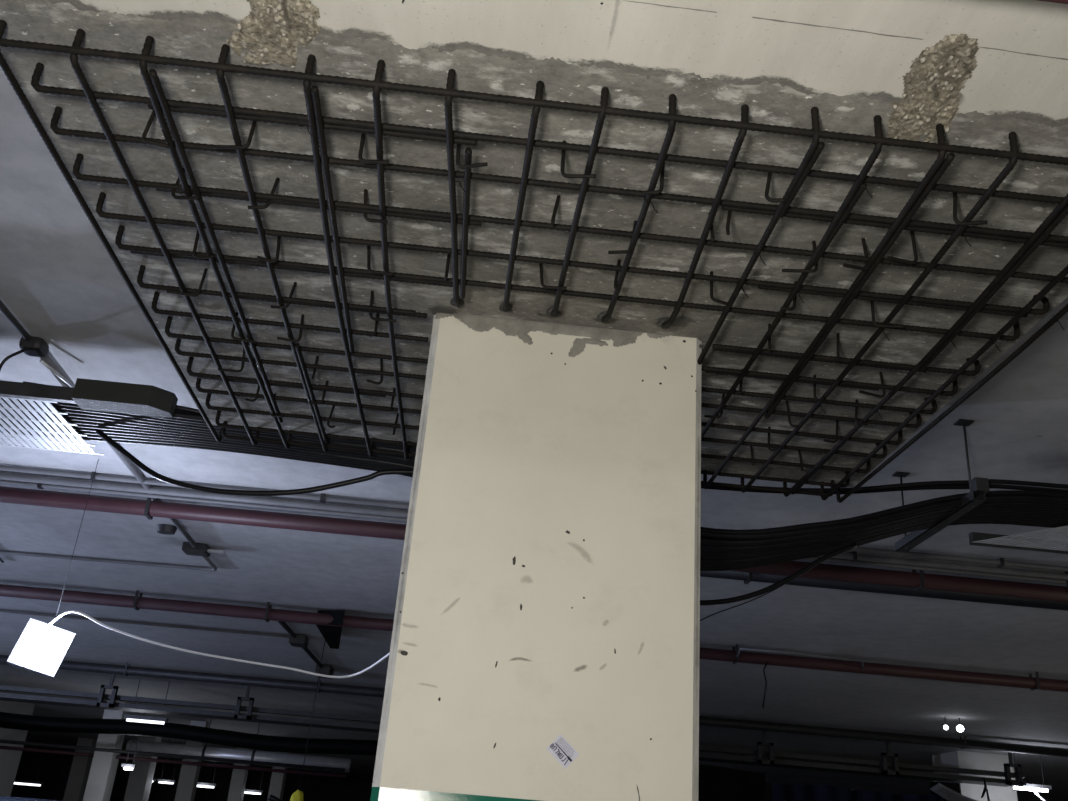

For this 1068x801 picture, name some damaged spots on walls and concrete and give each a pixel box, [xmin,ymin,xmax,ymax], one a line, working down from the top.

spalling [0,0,1068,503]